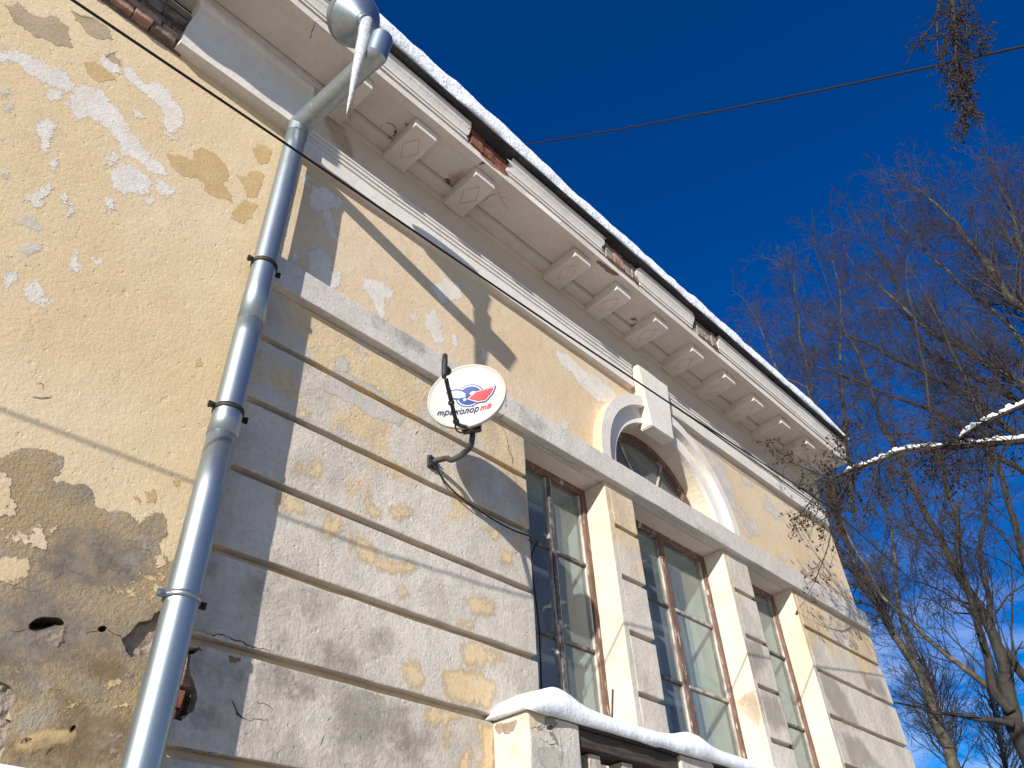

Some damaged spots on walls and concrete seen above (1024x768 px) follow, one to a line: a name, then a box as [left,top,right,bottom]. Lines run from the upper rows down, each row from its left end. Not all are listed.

flaking render [5,2,112,48]
peeling [17,118,75,256]
peeling [0,45,272,223]
spalling [466,129,509,177]
peeling [2,271,56,309]
peeling [556,350,617,403]
peeling [319,514,418,600]
peeling [0,448,173,768]
crack [205,631,270,651]
flaking render [173,650,191,720]
peeling [424,642,506,748]
peeling [458,720,517,768]